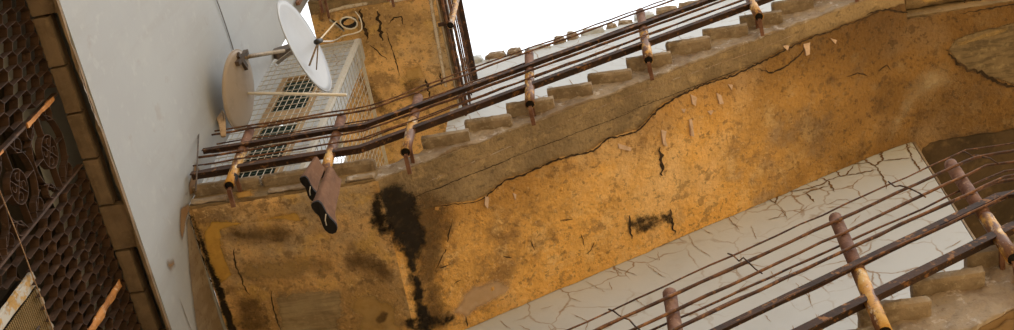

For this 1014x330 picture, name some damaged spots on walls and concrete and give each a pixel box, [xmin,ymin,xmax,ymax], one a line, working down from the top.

crack [358,9,403,75]
crack [415,8,921,284]
leakage [369,183,508,330]
crack [501,219,664,330]
leakage [629,209,676,238]